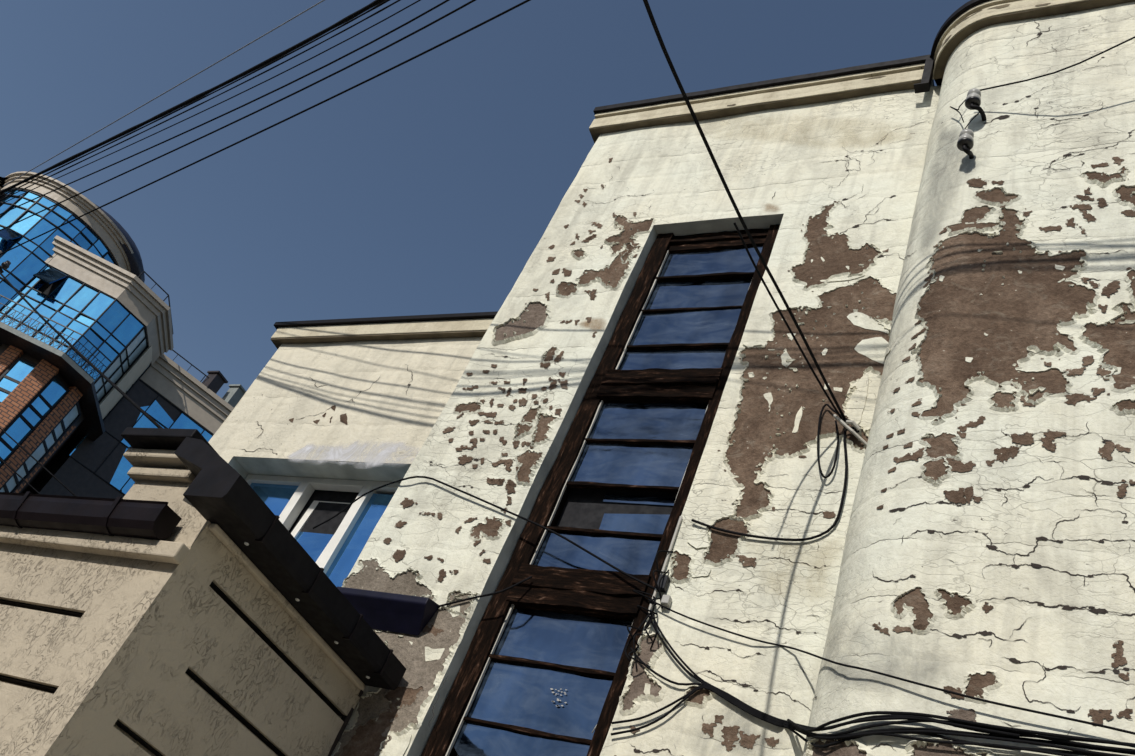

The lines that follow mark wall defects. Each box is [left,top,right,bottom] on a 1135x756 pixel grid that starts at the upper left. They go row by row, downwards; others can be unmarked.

crack [979,21,1133,190]
peeling [331,498,481,756]
peeling [442,345,568,563]
peeling [491,212,656,346]
crack [631,738,683,756]
crack [676,641,817,711]
crack [675,586,822,634]
peeling [669,201,897,584]
crack [767,474,839,514]
peeling [872,585,994,635]
peeling [883,157,1135,504]
crack [889,422,1135,735]